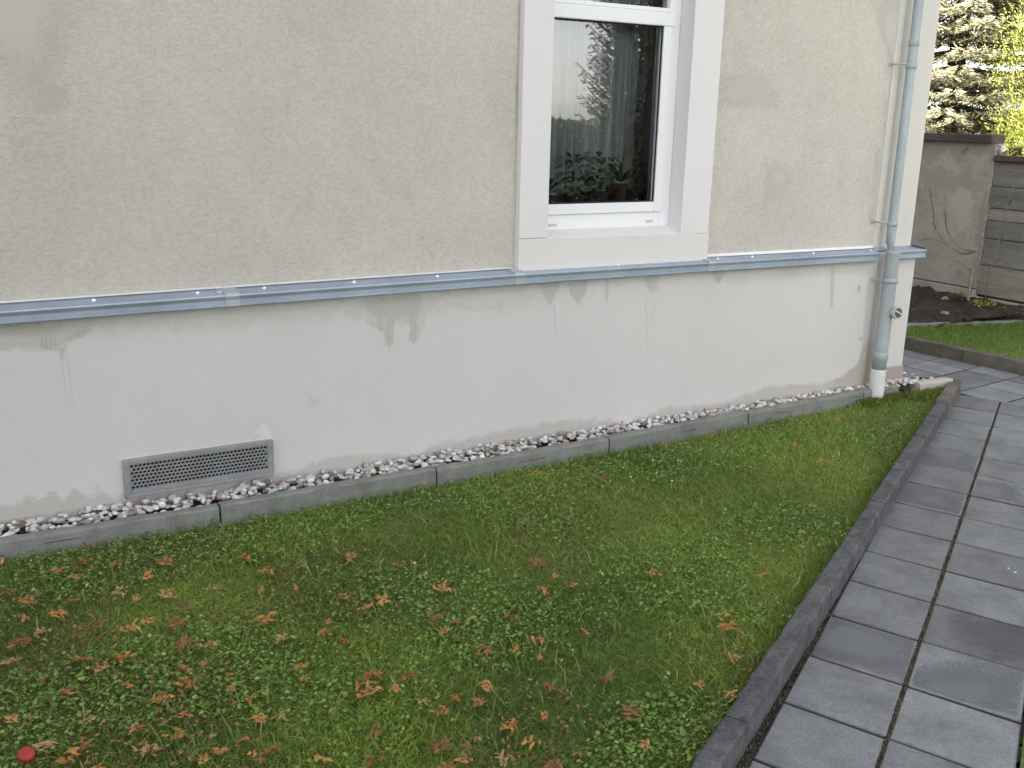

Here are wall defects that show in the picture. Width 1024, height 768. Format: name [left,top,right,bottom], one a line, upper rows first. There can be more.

water stain [0,261,883,529]